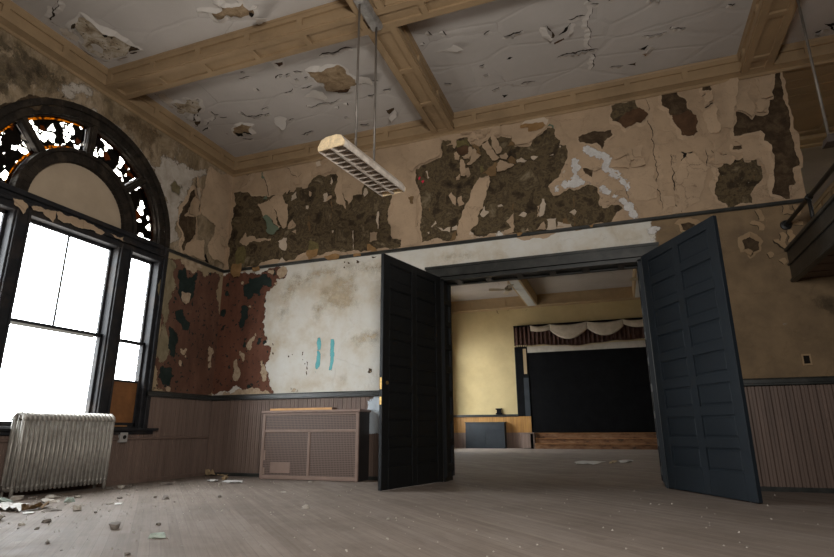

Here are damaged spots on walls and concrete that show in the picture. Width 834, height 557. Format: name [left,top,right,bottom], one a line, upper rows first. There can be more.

peeling [196,0,259,23]
damp [0,37,66,111]
peeling [303,64,373,101]
flaking render [140,72,803,395]